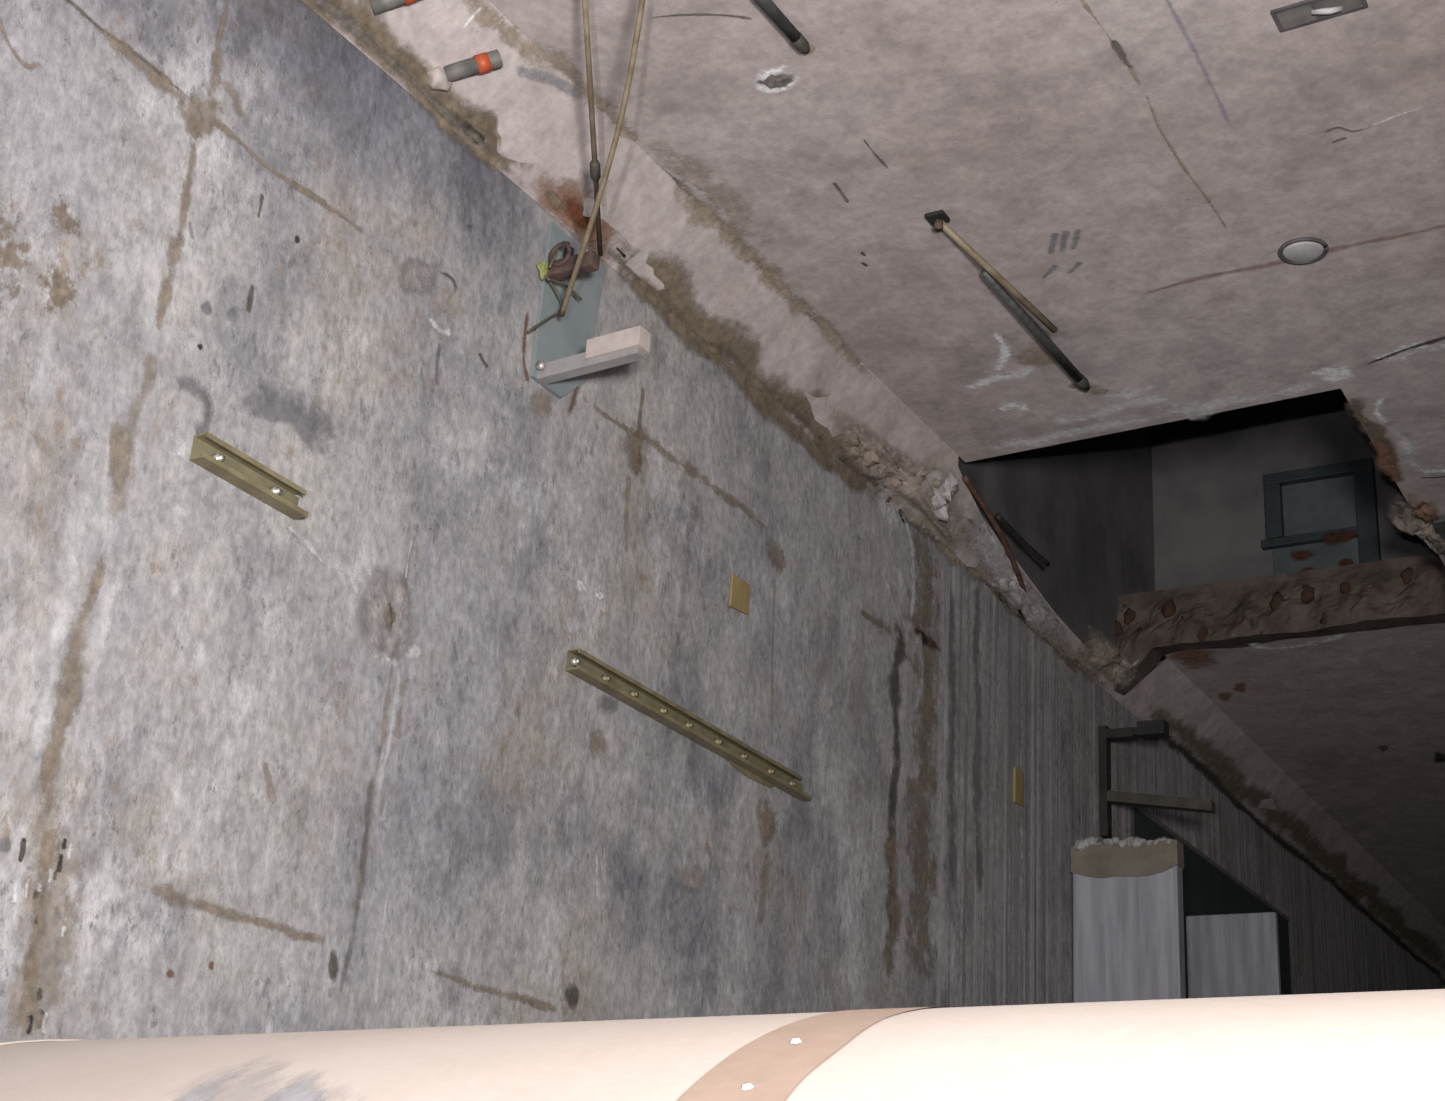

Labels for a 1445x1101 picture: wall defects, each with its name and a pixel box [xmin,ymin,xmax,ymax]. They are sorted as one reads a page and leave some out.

crack [67,0,183,99]
damp [157,0,242,329]
crack [215,120,361,231]
damp [304,0,513,170]
rust [540,182,613,255]
crack [1082,0,1226,227]
damp [997,365,1353,449]
crack [1370,337,1445,363]
spalling [962,475,1050,592]
damp [609,245,1104,976]
damp [1152,711,1445,982]
crack [153,885,338,978]